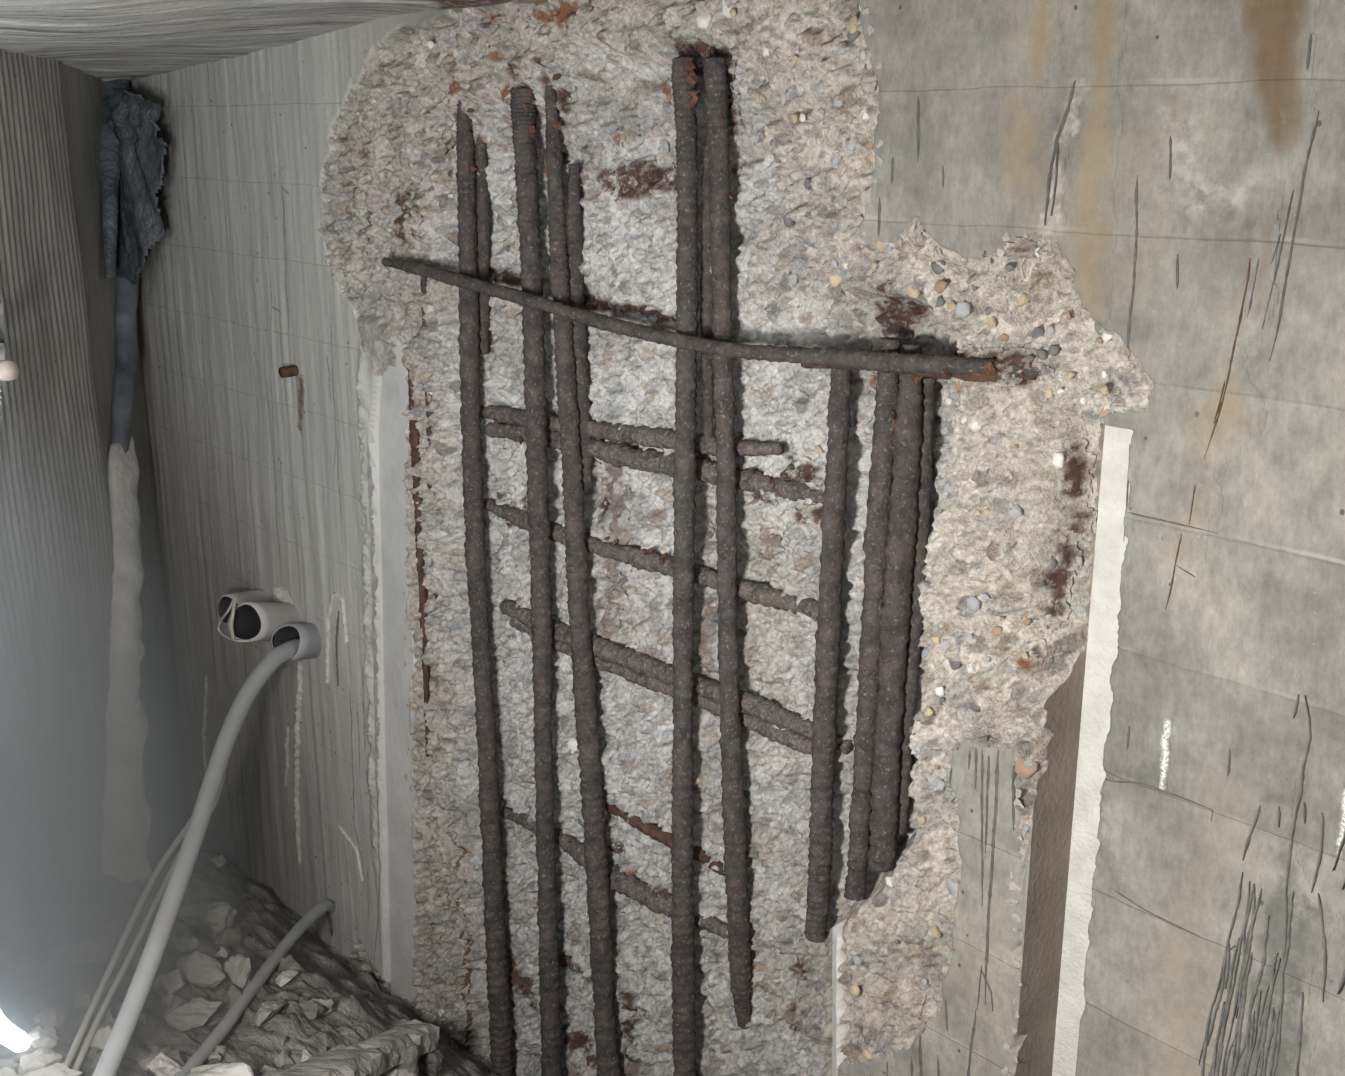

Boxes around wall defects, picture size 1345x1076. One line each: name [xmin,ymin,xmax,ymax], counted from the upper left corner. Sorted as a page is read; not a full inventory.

rust [434,45,576,185]
rust [561,126,677,228]
rust [658,37,745,180]
rust [584,291,677,327]
rust [869,280,937,341]
crack [1123,111,1319,609]
rust [589,459,636,645]
spalling [318,0,1153,1076]
rust [743,451,827,573]
rust [1011,439,1097,672]
rust [694,590,719,680]
rust [613,975,654,1076]